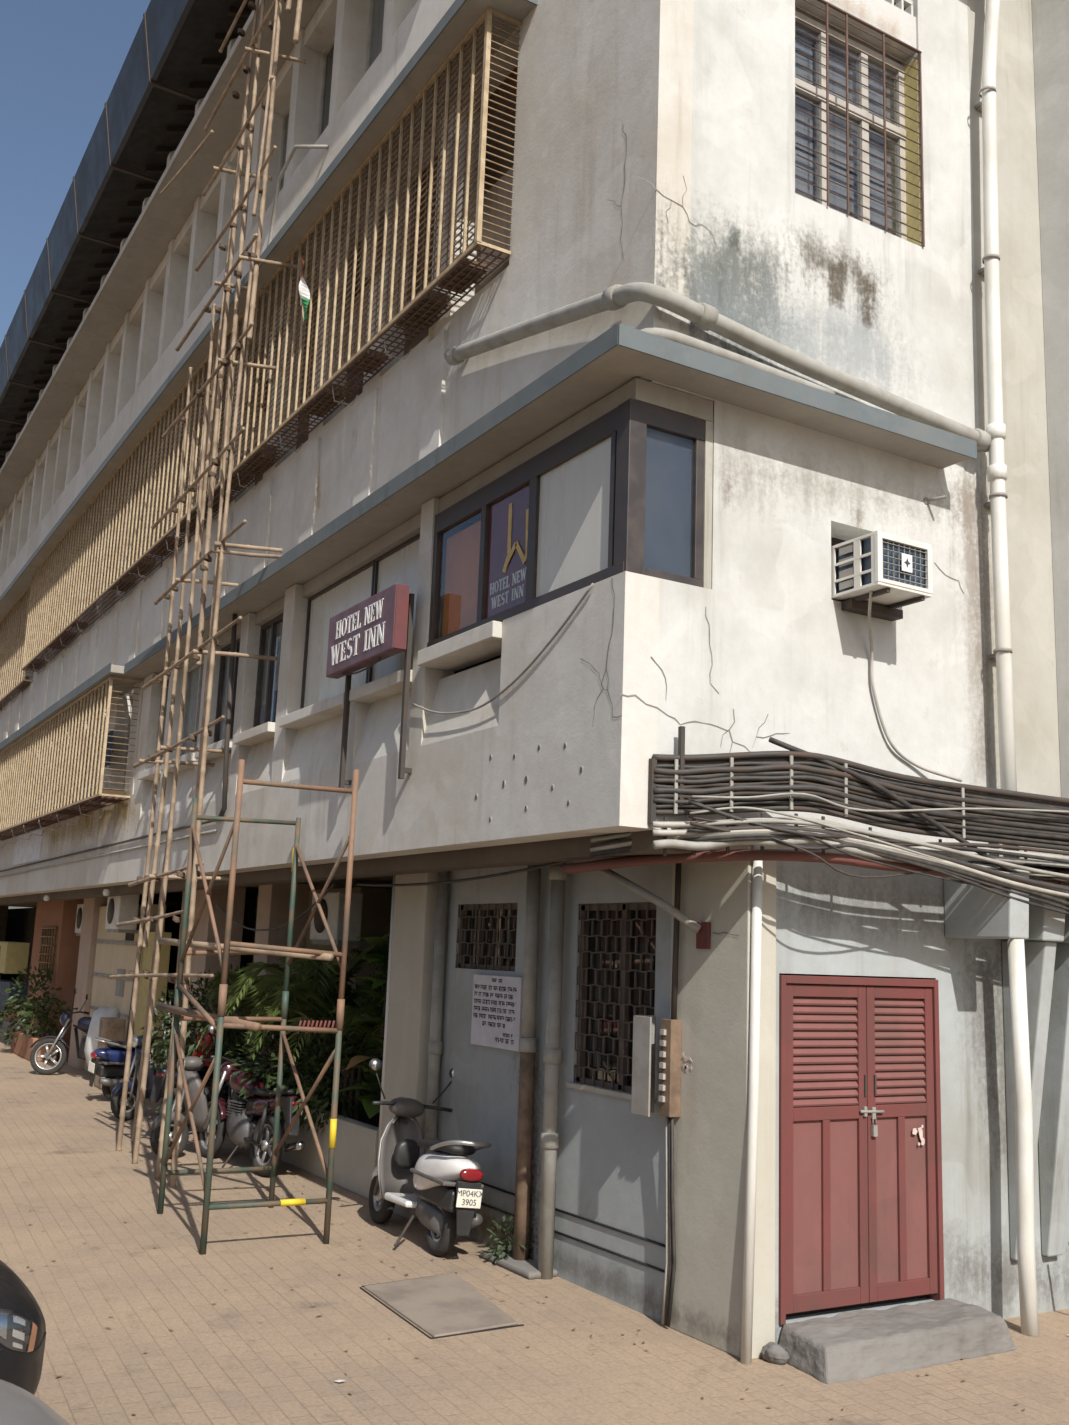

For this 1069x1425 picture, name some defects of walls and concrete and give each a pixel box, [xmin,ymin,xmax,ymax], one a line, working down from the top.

crack [610,131,716,259]
leakage [685,231,771,332]
leakage [805,245,874,322]
crack [581,583,788,752]